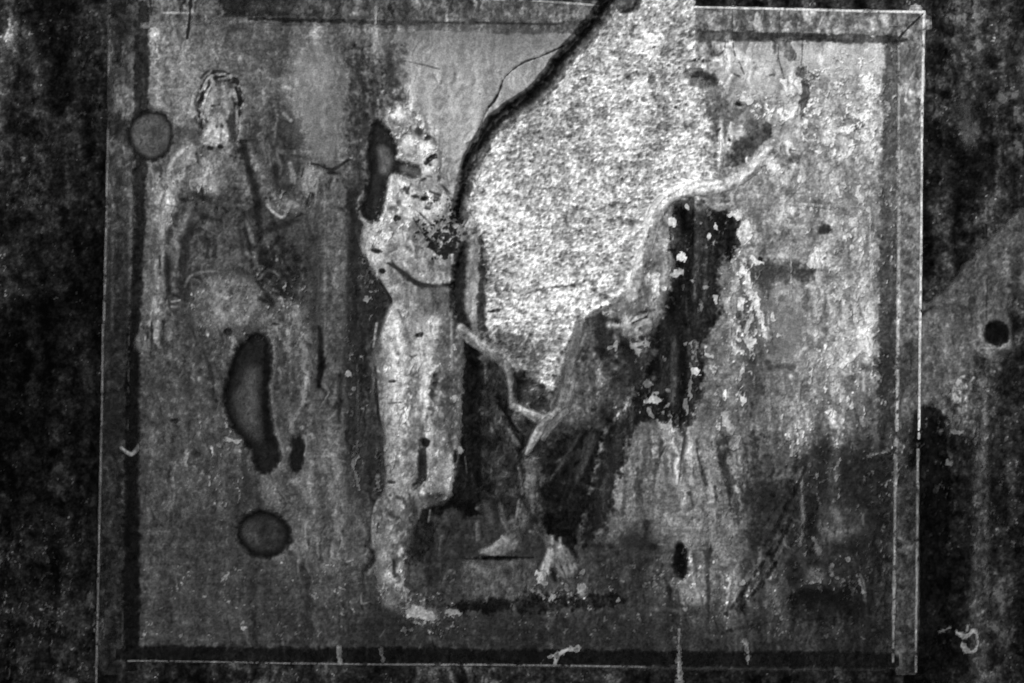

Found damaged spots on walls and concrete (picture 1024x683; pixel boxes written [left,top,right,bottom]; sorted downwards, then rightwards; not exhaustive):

leakage [347,44,405,207]
crack [485,45,563,113]
flaking render [344,0,898,500]
peeling [672,184,924,615]